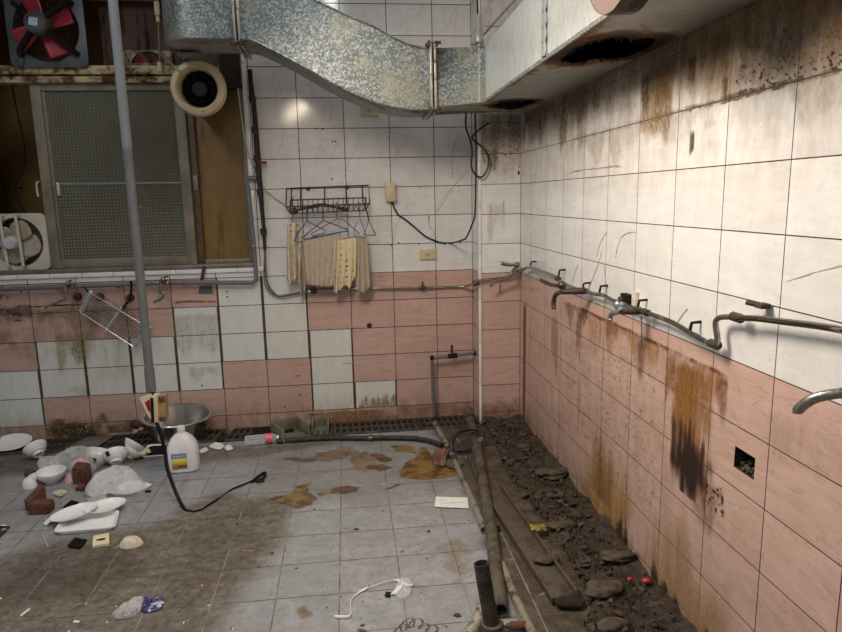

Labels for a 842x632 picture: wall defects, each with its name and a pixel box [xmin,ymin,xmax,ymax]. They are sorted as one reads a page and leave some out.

leakage [642,63,672,133]
leakage [690,24,841,111]
mould [47,414,147,438]
rust [585,392,654,546]
rust [565,304,726,516]